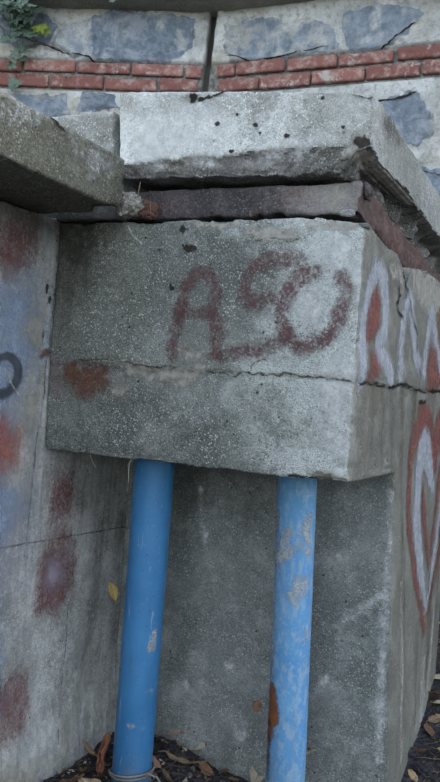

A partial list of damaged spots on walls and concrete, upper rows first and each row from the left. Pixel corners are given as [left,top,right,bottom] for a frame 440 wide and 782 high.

damp [131,102,226,177]
spalling [344,132,414,207]
crack [397,271,418,348]
spalling [389,263,440,316]
crack [78,358,177,369]
crack [209,359,440,404]
corrosion [267,682,279,766]